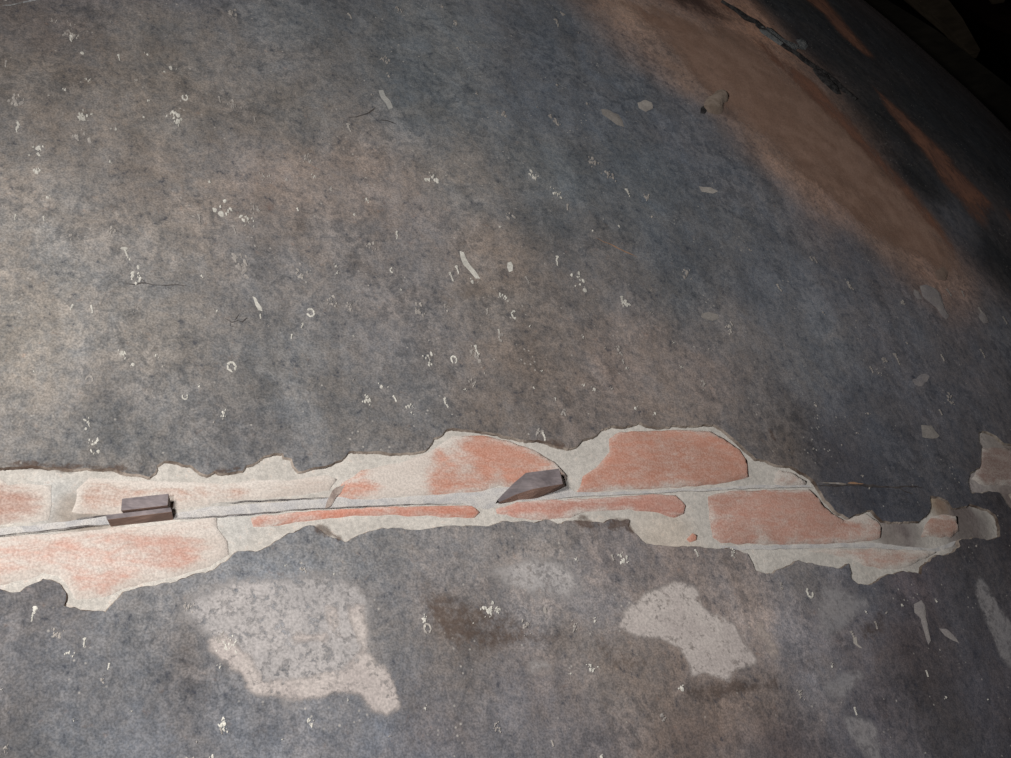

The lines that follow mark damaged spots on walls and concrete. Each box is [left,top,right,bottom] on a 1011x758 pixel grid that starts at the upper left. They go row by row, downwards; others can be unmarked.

rust [809,0,869,55]
rust [881,95,990,220]
flaking render [0,422,1011,612]